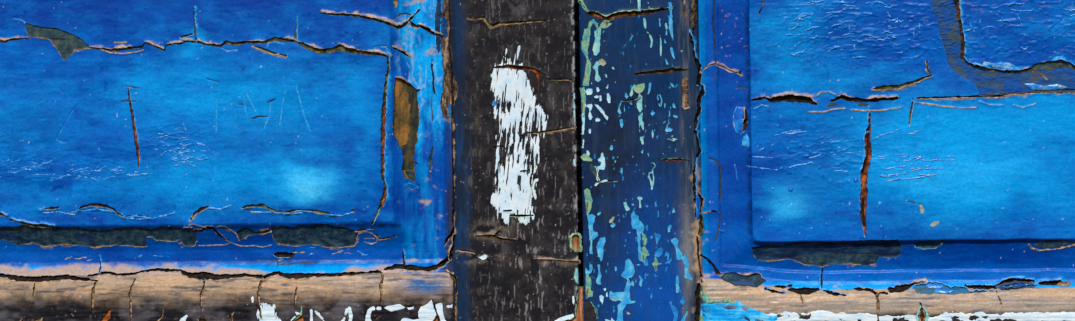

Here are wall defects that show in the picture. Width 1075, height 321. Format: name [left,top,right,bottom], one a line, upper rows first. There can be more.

peeling [14,18,95,61]
peeling [0,223,396,267]
crack [0,7,443,228]
crack [0,118,581,321]
peeling [392,0,459,190]
crack [467,16,550,28]
crack [494,64,572,91]
peeling [573,0,1075,321]
crack [578,0,1075,321]